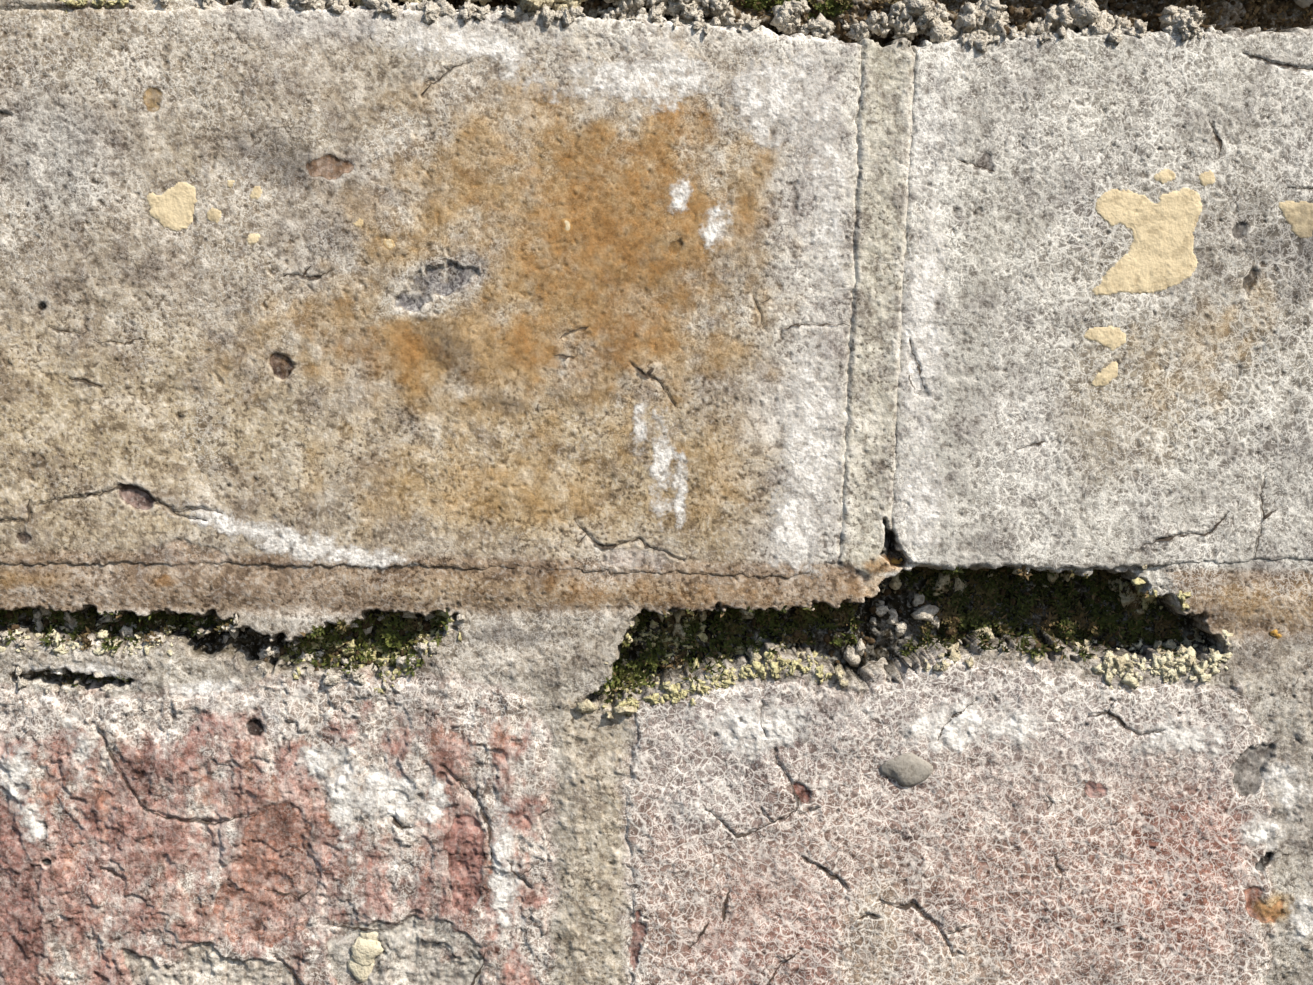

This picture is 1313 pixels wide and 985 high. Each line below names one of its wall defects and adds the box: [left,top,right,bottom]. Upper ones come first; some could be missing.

crack [1243,52,1313,70]
spalling [396,263,475,312]
crack [0,483,223,522]
crack [1144,511,1230,545]
crack [1255,476,1276,557]
spalling [603,548,670,569]